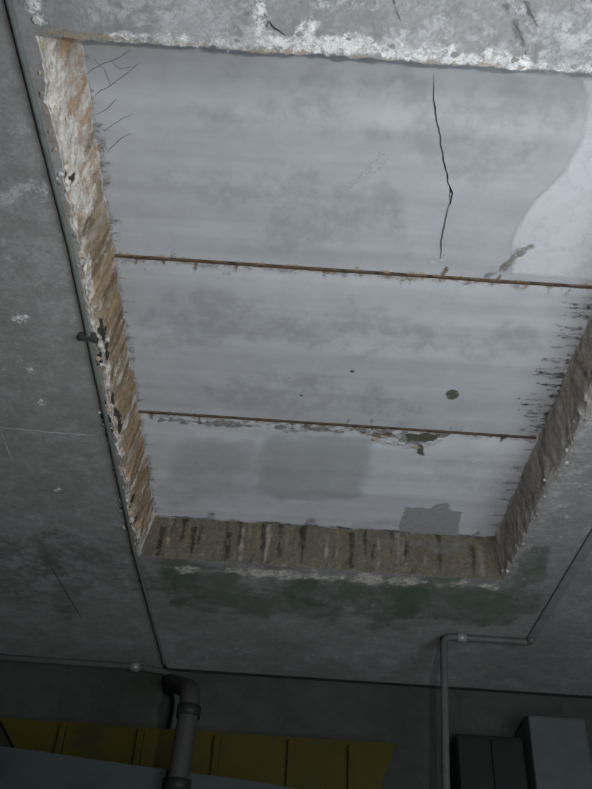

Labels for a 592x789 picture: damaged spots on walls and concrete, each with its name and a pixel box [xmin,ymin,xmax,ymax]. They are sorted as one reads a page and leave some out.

water stain [80,0,592,280]
crack [429,88,453,264]
water stain [38,36,132,493]
corrosion [38,27,592,580]
spalling [91,318,110,367]
spalling [98,392,123,443]
peeling [305,426,450,456]
water stain [518,371,564,436]
water stain [501,390,592,575]
water stain [333,504,493,554]
water stain [226,568,467,602]